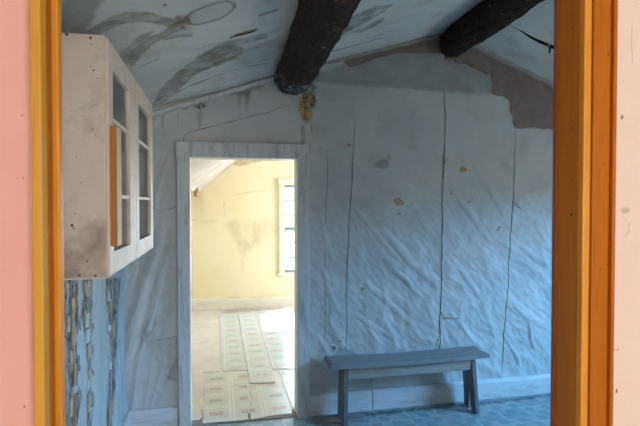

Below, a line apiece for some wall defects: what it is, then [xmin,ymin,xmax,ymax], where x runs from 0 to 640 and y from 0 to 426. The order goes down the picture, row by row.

peeling [344,34,553,129]
crack [323,124,357,350]
crack [436,86,449,349]
crack [502,128,522,373]